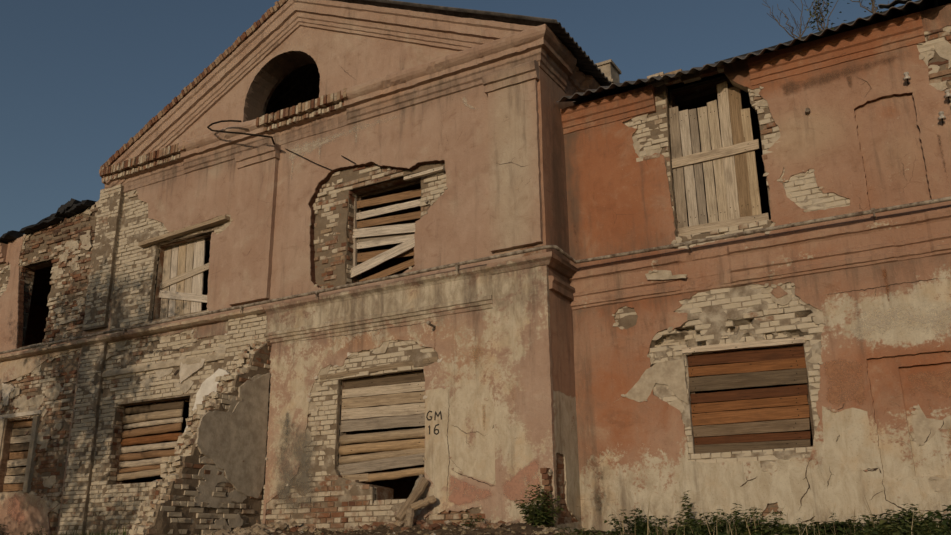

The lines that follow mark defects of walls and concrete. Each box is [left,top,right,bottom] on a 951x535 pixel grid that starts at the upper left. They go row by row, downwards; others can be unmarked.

spalling [917,26,951,110]
spalling [100,141,186,183]
spalling [623,65,850,249]
spalling [309,163,448,289]
spalling [0,200,99,535]
spalling [85,190,266,535]
spalling [260,340,485,531]
peeling [423,386,496,490]
crack [447,397,495,485]
spalling [612,282,873,483]
crack [800,458,834,529]